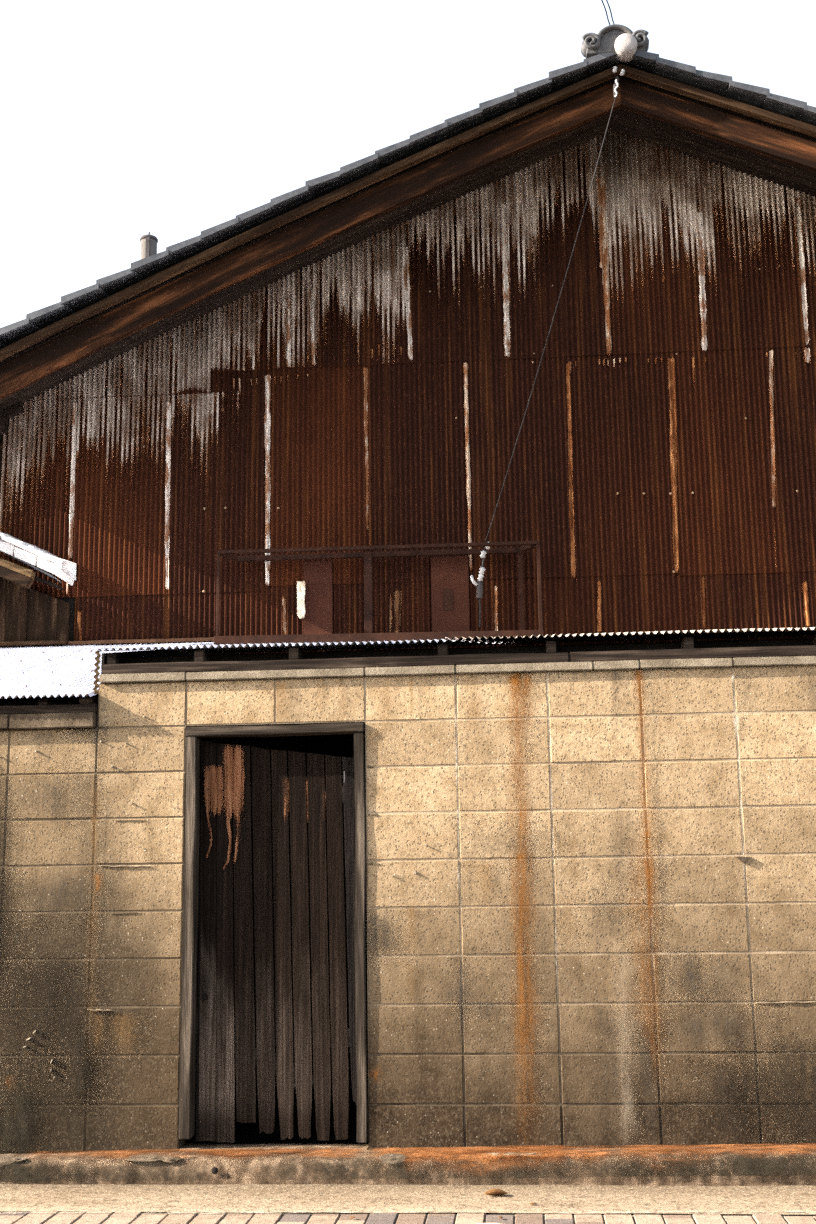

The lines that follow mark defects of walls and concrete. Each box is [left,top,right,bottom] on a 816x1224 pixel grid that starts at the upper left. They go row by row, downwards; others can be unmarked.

peeling [206,780,241,869]
corrosion [374,1145,609,1167]
corrosion [624,1143,816,1156]